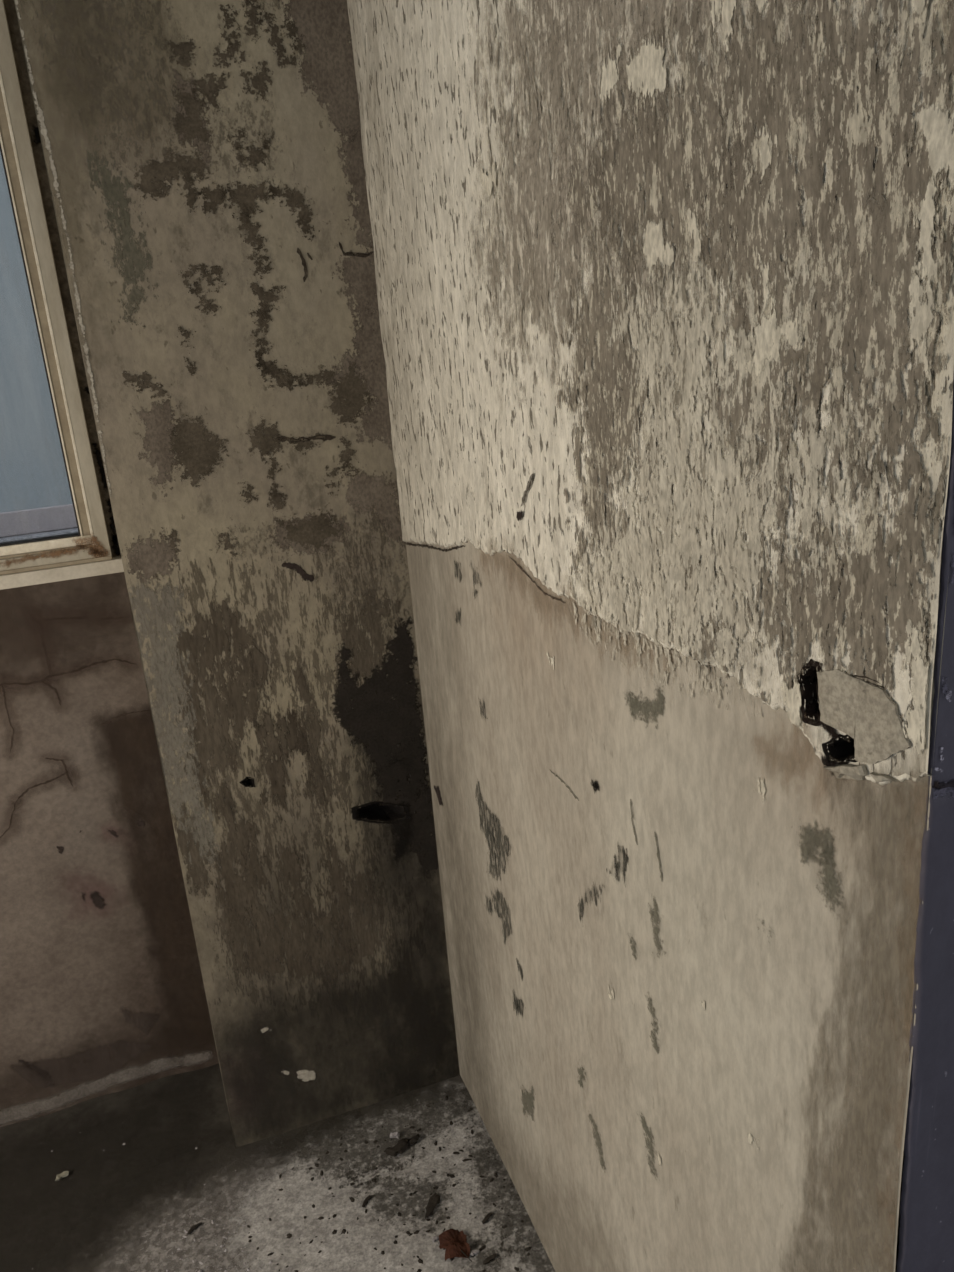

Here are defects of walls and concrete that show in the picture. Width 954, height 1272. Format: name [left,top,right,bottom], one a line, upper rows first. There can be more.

damp [85,136,158,328]
peeling [454,0,954,782]
crack [0,614,137,752]
crack [0,758,73,838]
damp [96,587,460,1139]
crack [931,780,954,800]